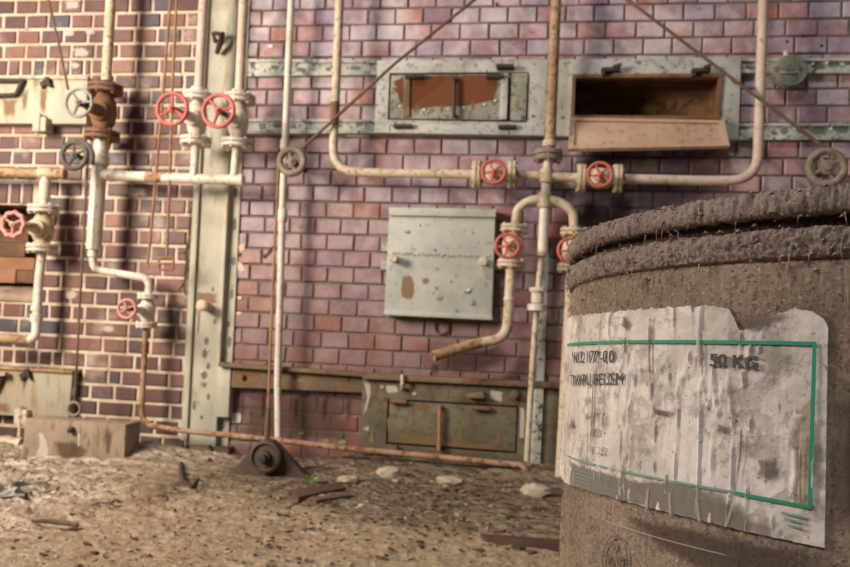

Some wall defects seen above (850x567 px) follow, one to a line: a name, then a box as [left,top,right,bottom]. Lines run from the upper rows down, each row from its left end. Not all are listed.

rust [4,93,27,115]
rust [401,275,438,298]